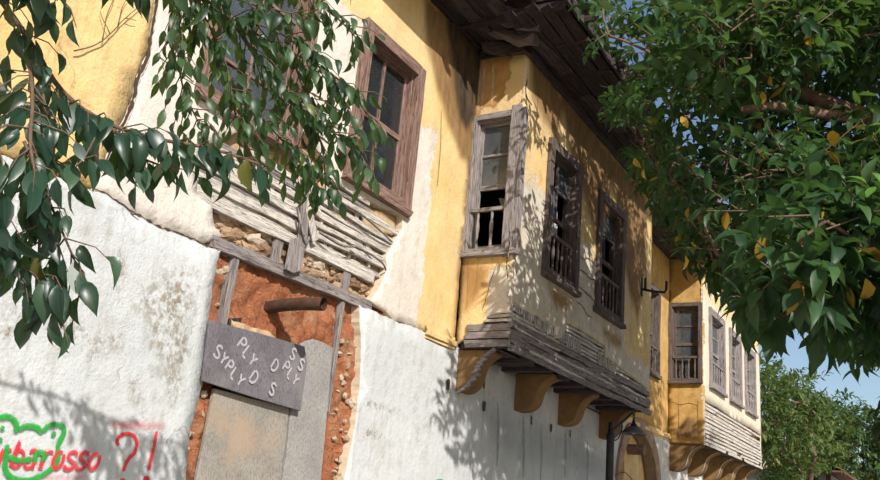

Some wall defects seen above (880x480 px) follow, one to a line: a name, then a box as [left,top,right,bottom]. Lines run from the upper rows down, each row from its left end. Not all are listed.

peeling [475,56,512,116]
mould [146,274,190,384]
flaking render [197,133,400,480]
crack [482,231,512,310]
flaking render [185,381,212,480]